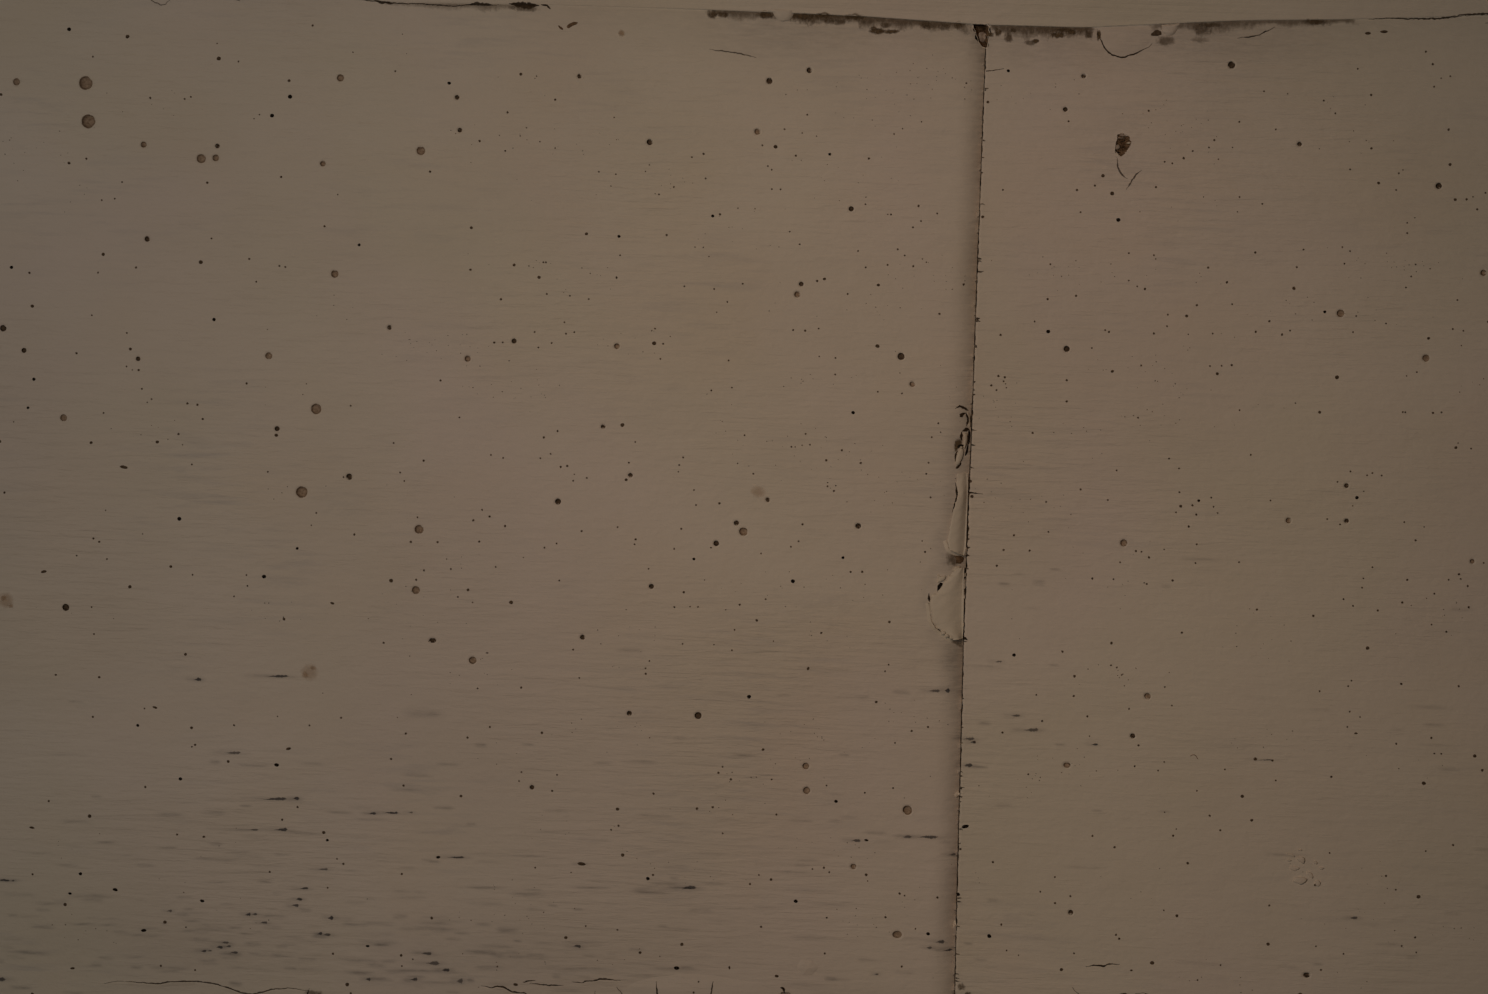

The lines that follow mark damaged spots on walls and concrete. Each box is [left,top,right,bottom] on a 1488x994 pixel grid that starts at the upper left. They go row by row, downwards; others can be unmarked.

crack [1372,12,1488,20]
crack [1097,31,1152,58]
peeling [955,405,971,469]
crack [954,46,1004,994]
crack [480,978,658,994]
crack [1072,963,1146,994]